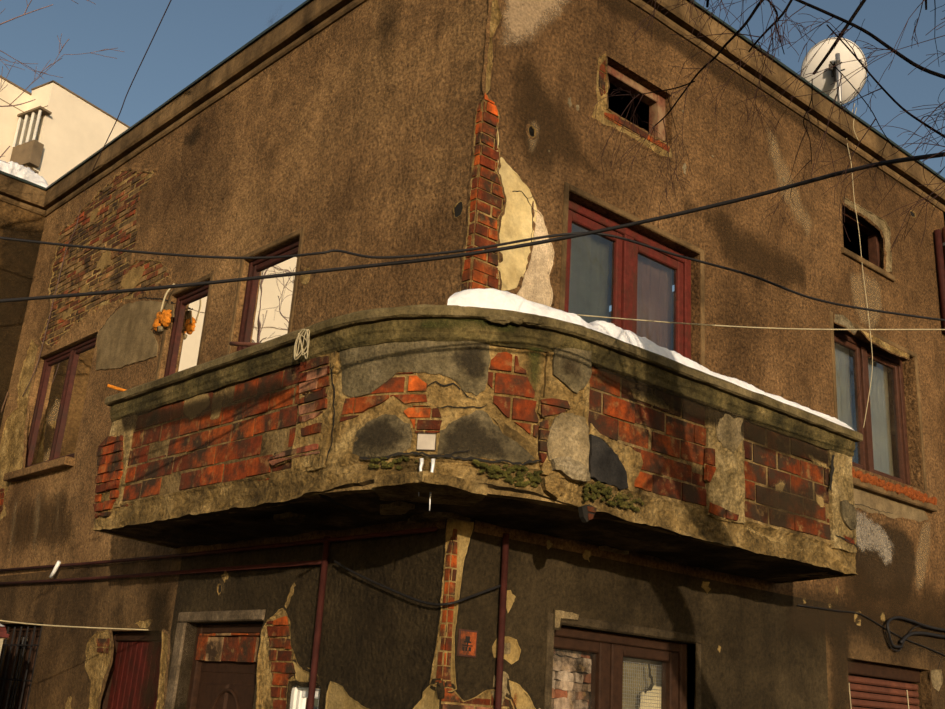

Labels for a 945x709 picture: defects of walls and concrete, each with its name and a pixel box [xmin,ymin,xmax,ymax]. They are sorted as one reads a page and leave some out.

flaking render [457,0,564,308]
leakage [518,65,581,168]
flaking render [567,51,687,175]
leakage [708,213,805,284]
flaking render [0,163,173,526]
spalling [374,471,488,515]
flaking render [268,340,643,493]
flaking render [708,502,739,523]
flaking render [704,409,745,483]
flaking render [85,625,114,709]
flaking render [195,583,380,709]
flaking render [395,518,544,709]